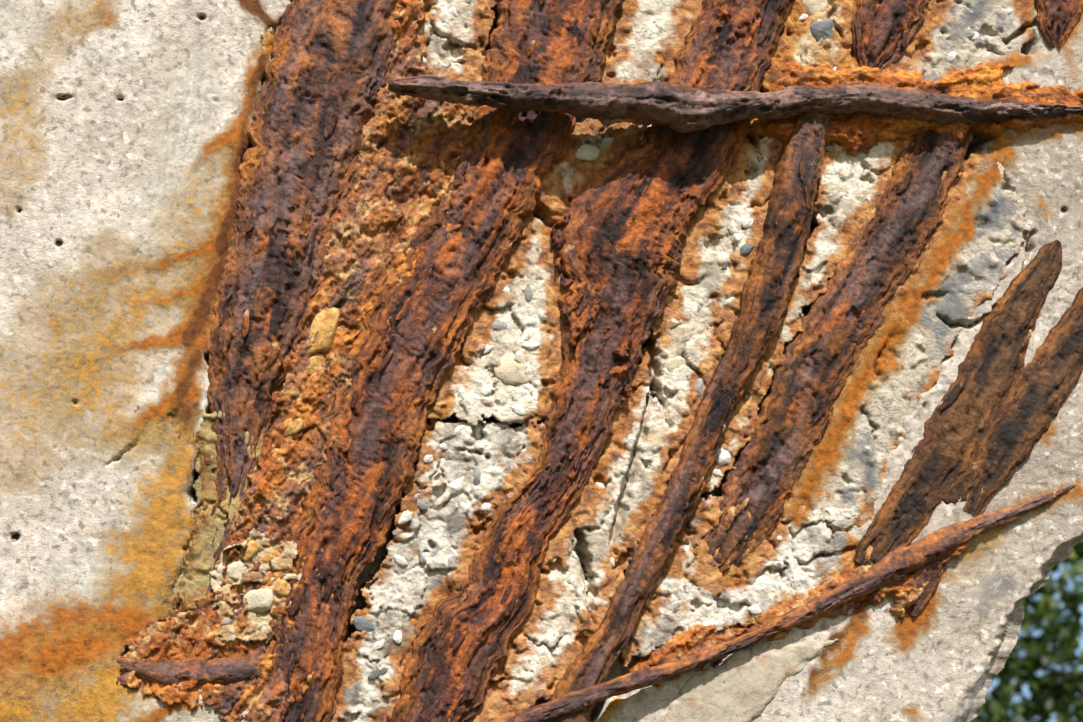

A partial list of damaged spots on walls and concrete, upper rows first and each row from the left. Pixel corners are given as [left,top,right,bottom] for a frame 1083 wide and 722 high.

spalling [600,0,702,85]
spalling [880,0,1036,82]
rust [0,0,280,722]
spalling [172,410,303,644]
rust [285,580,304,618]
spalling [329,118,654,722]
spalling [469,131,783,722]
rust [723,497,750,531]
spalling [618,136,1031,667]
rust [809,600,870,693]
rust [892,565,948,651]
rust [790,121,1083,527]